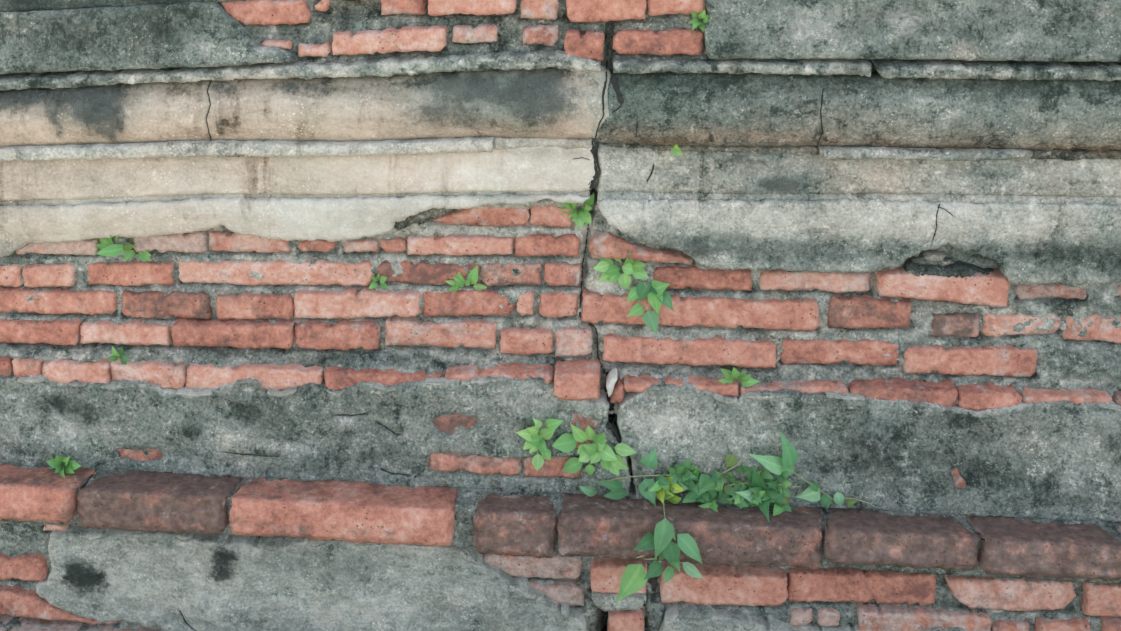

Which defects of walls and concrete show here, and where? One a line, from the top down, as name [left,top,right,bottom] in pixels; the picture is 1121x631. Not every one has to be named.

spalling [220,0,709,72]
water stain [0,86,125,140]
crack [205,80,213,140]
crack [574,61,638,189]
spalling [0,188,1121,479]
crack [579,224,633,480]
spalling [951,468,966,488]
spalling [0,521,161,631]
peeling [257,536,287,551]
spalling [457,546,1121,631]